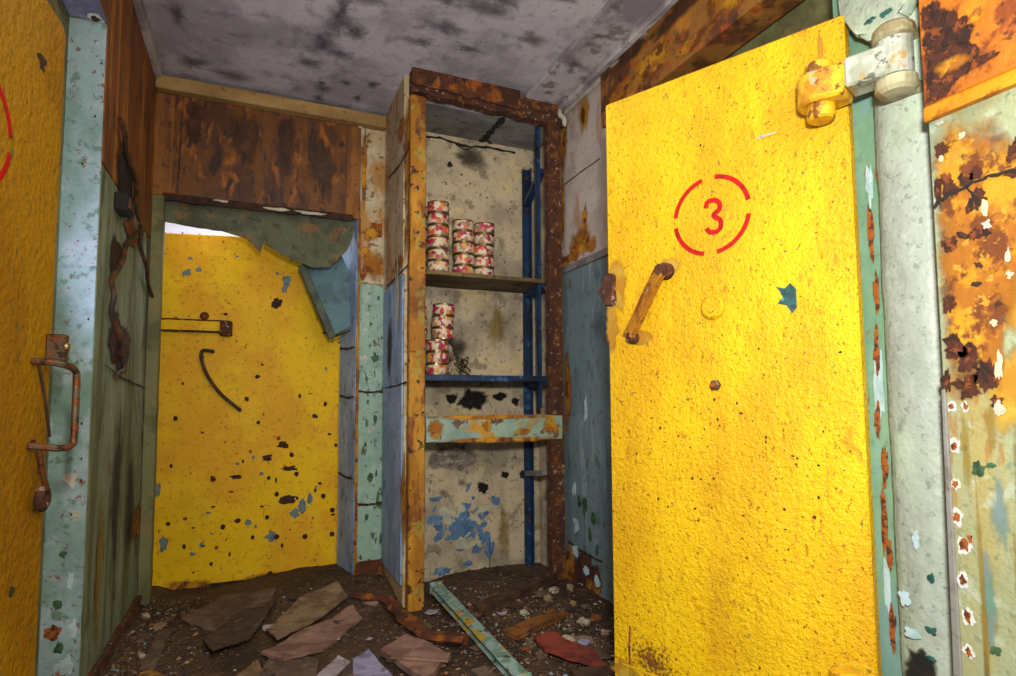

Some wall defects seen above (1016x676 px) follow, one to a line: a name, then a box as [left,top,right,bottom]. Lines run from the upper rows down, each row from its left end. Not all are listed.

rust [918,0,1016,126]
rust [579,99,589,132]
rust [560,126,596,267]
crack [933,169,1016,211]
peeling [271,272,291,309]
rust [934,126,1016,437]
rust [428,355,571,443]
spalling [429,442,476,471]
rust [950,427,970,490]
peeling [427,482,500,577]
rust [953,507,989,675]